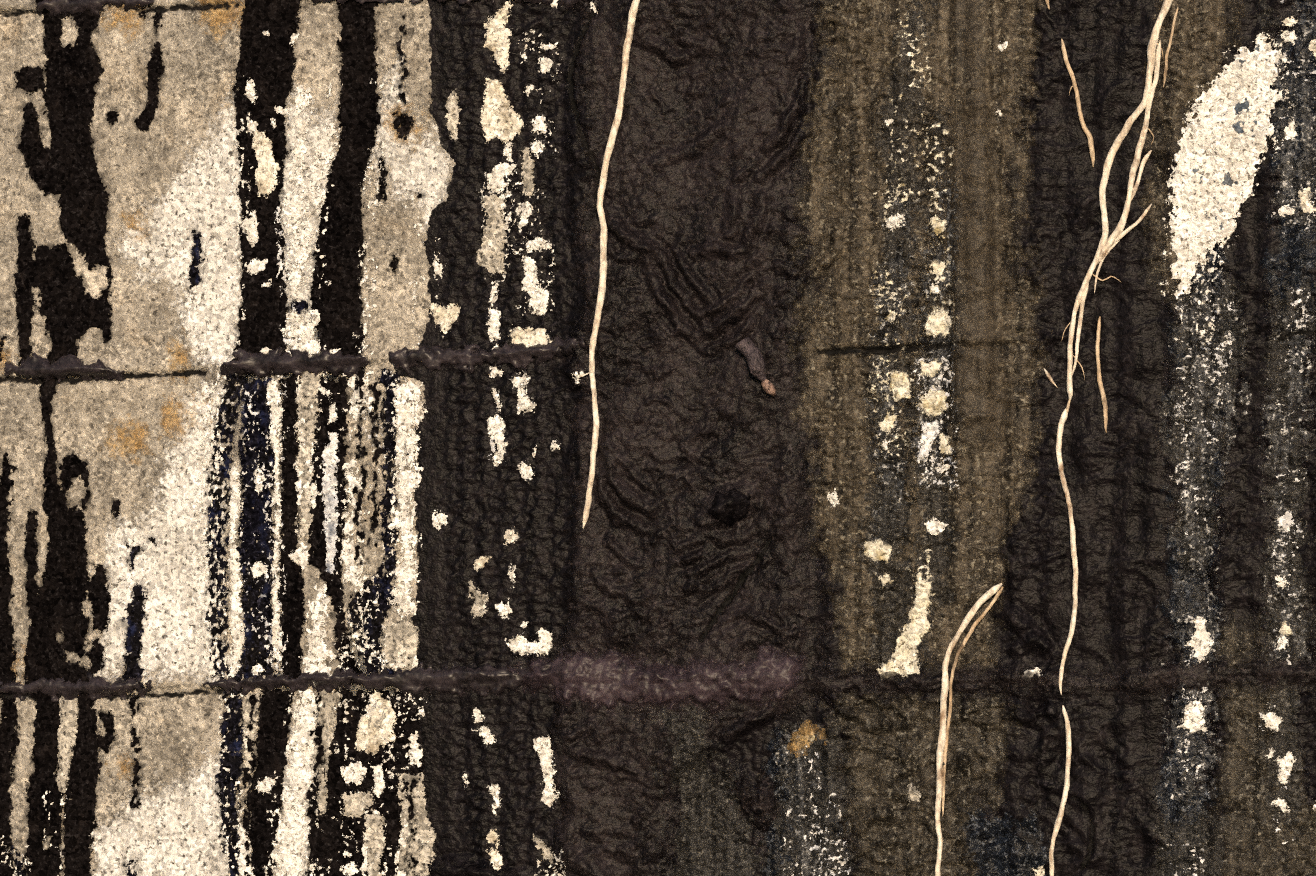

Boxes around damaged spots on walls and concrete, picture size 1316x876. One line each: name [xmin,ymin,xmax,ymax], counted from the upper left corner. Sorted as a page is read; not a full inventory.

peeling [476,0,563,348]
peeling [1159,0,1316,520]
peeling [487,366,560,481]
peeling [1184,616,1214,666]
peeling [1272,511,1304,665]
peeling [1177,687,1208,780]